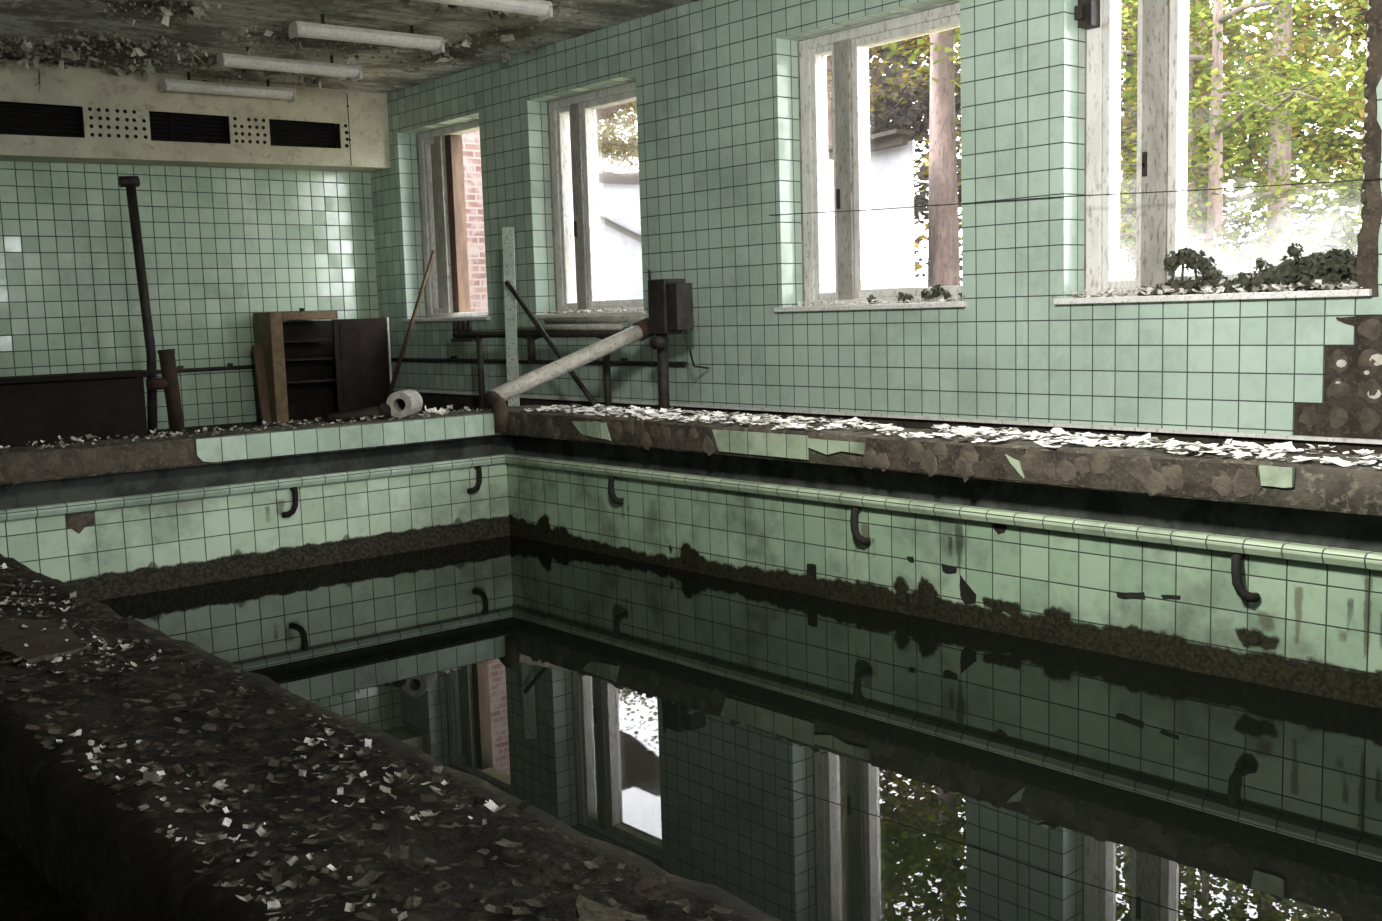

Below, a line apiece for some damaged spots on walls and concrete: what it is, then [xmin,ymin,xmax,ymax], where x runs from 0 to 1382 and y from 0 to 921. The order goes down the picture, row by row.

peeling [0,0,583,89]
spalling [1356,0,1382,297]
peeling [1294,316,1382,455]
peeling [66,511,94,534]
spalling [993,524,1007,534]
spalling [806,564,817,578]
spalling [942,564,976,604]
spalling [1116,592,1181,600]
spalling [576,894,650,921]